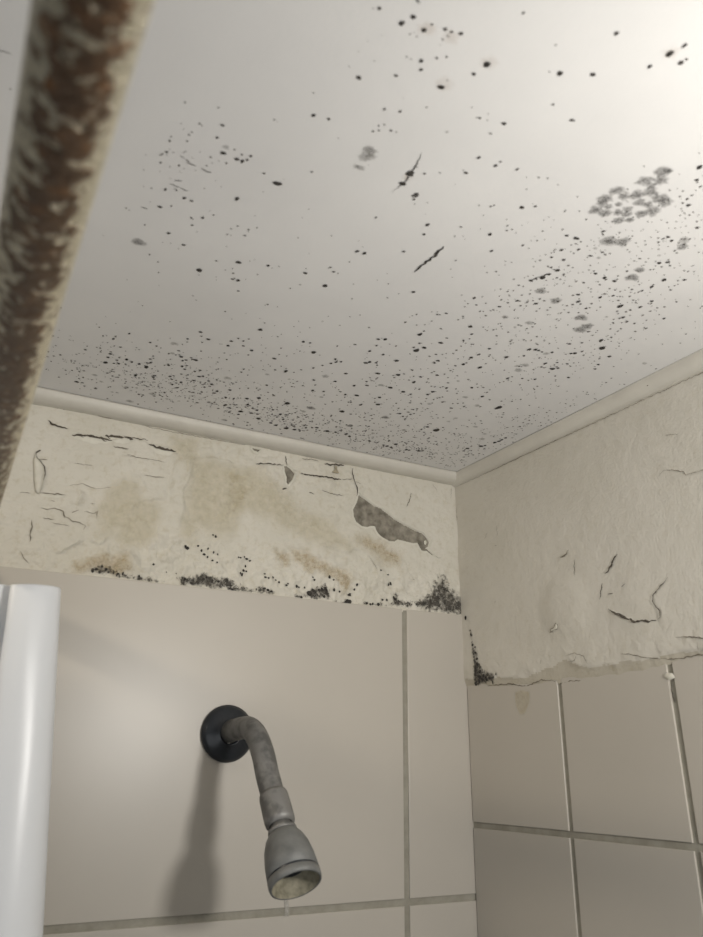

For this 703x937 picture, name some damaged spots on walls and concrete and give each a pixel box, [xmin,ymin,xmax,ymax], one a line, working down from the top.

damp [160,123,252,173]
damp [46,165,703,466]
crack [20,409,241,561]
crack [305,459,359,483]
spalling [250,446,438,558]
damp [91,565,158,582]
damp [166,556,358,604]
damp [364,569,466,620]
crack [561,552,667,623]
damp [470,630,496,686]
crack [489,653,588,686]
crack [630,636,703,660]